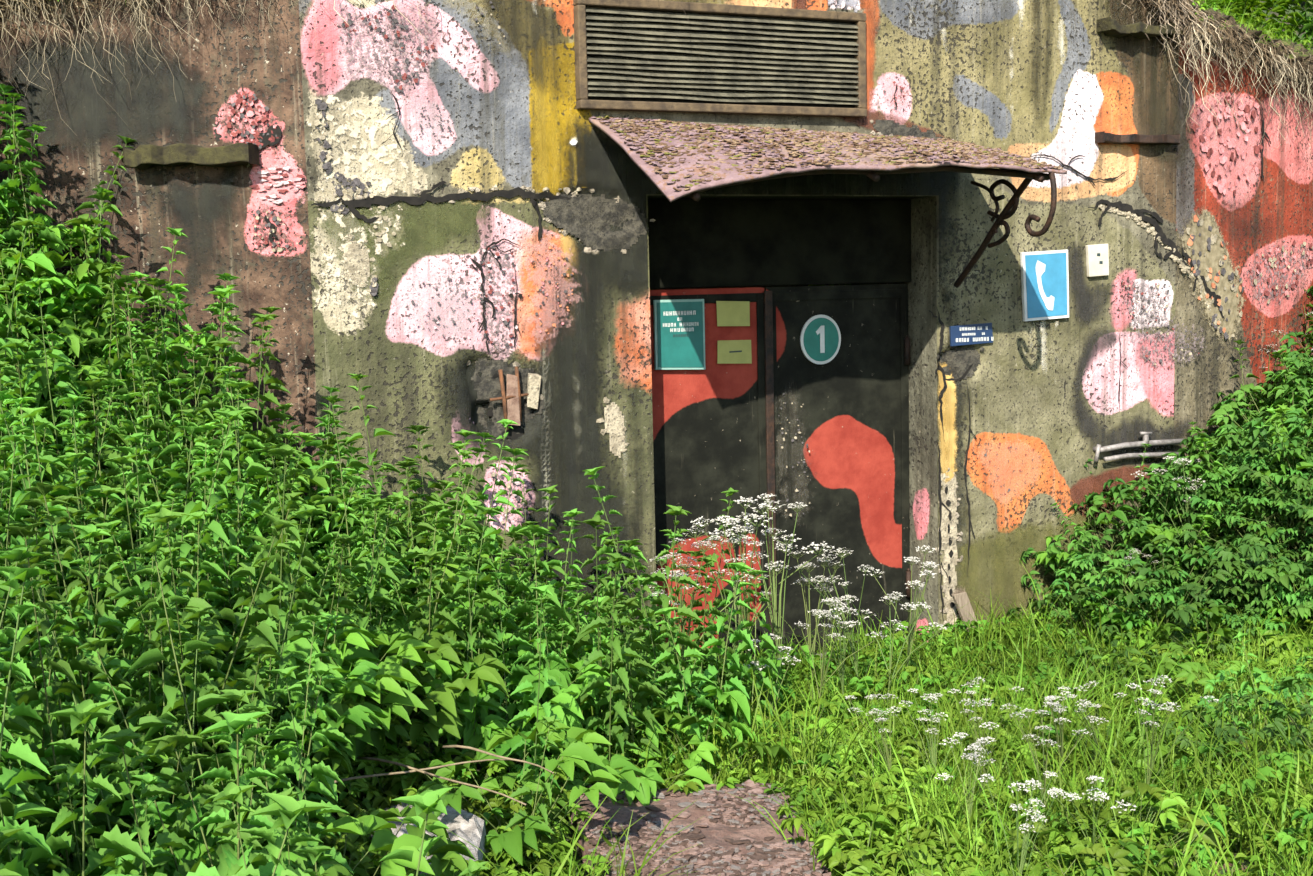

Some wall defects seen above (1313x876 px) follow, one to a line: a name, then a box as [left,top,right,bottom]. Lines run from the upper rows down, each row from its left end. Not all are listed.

damp [0,35,207,153]
damp [160,167,238,287]
spalling [406,189,655,440]
crack [1027,154,1224,330]